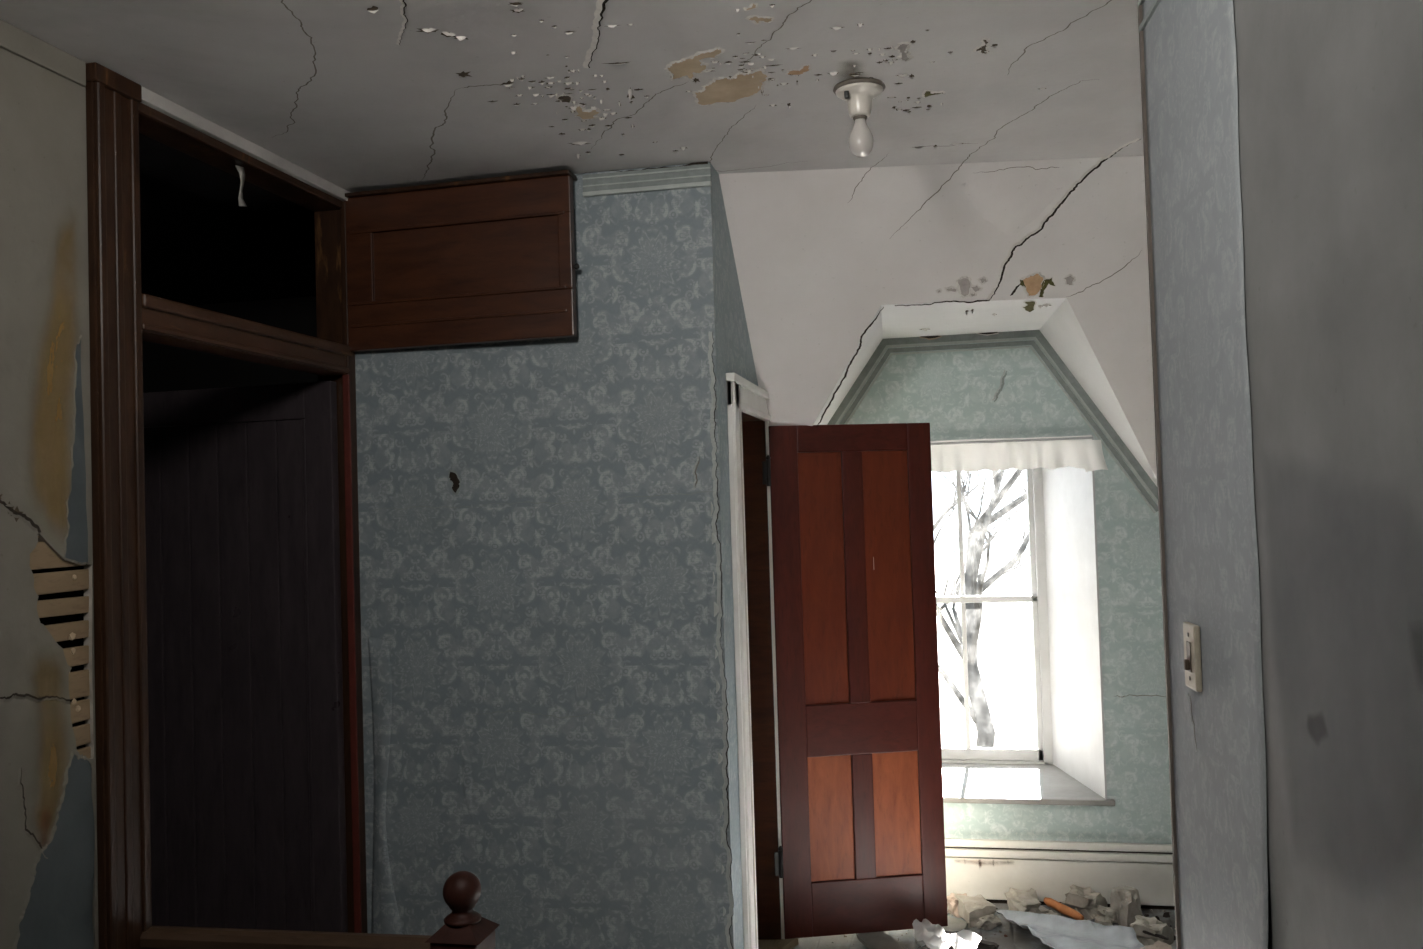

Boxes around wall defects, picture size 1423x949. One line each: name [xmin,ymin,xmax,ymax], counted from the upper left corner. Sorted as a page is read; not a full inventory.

crack [275,0,317,136]
crack [583,0,609,68]
peeling [664,3,946,113]
peeling [972,38,998,55]
crack [421,84,513,181]
peeling [935,276,988,298]
crack [817,79,1142,426]
water stain [37,287,72,525]
crack [0,494,41,534]
peeling [12,332,96,949]
crack [0,693,70,704]